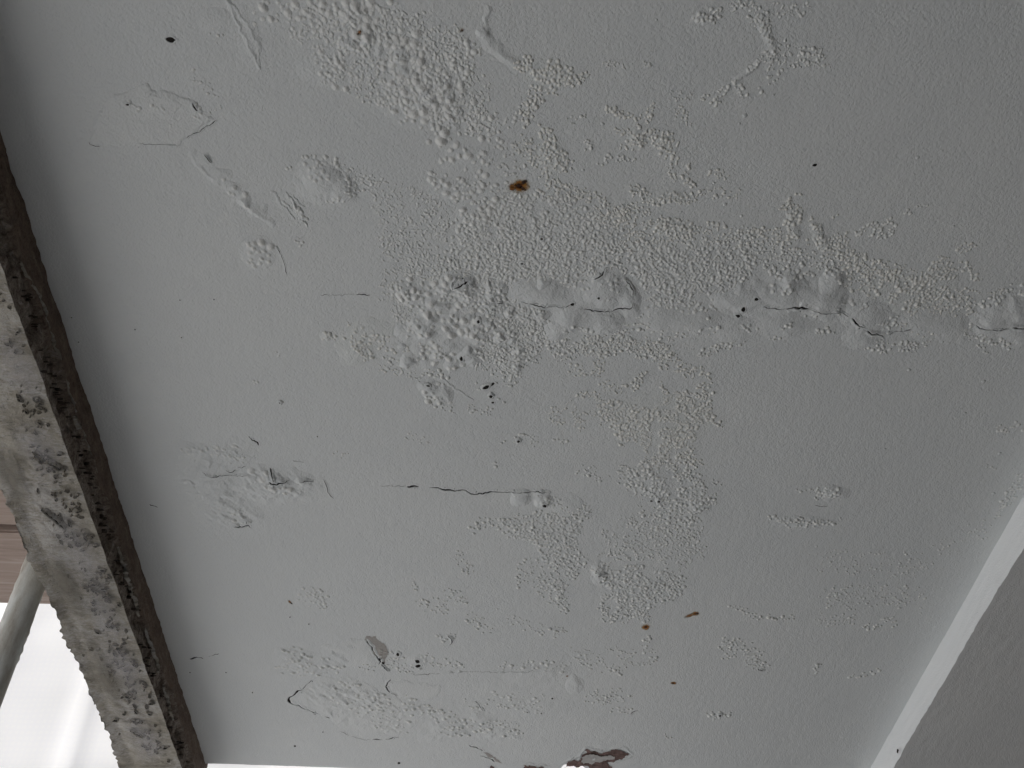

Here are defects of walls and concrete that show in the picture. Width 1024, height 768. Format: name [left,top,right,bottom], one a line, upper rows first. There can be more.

corrosion [509,180,528,192]
crack [496,264,636,315]
crack [762,302,911,339]
crack [975,323,1024,332]
crack [380,483,551,497]
peeling [365,636,399,664]
peeling [519,745,634,768]